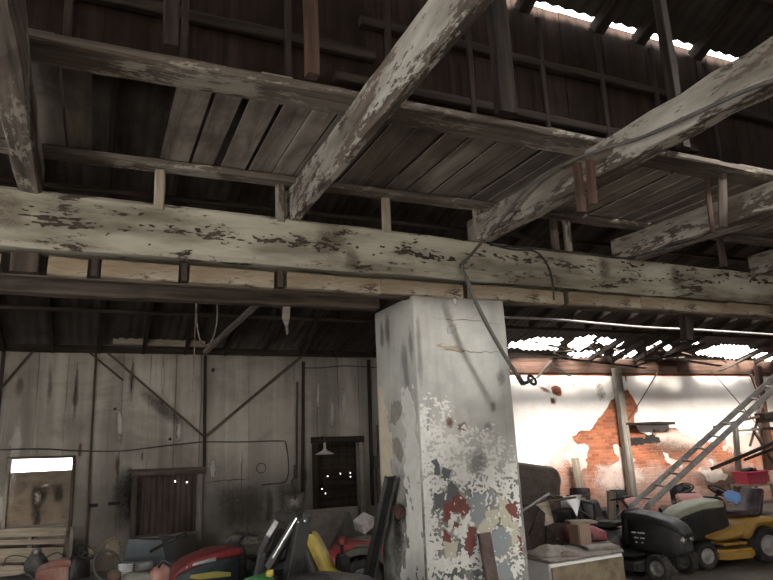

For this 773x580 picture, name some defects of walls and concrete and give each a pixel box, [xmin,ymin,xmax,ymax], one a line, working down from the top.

peeling [18,205,359,253]
peeling [394,246,474,266]
peeling [482,250,603,280]
peeling [617,261,773,290]
peeling [378,376,773,580]